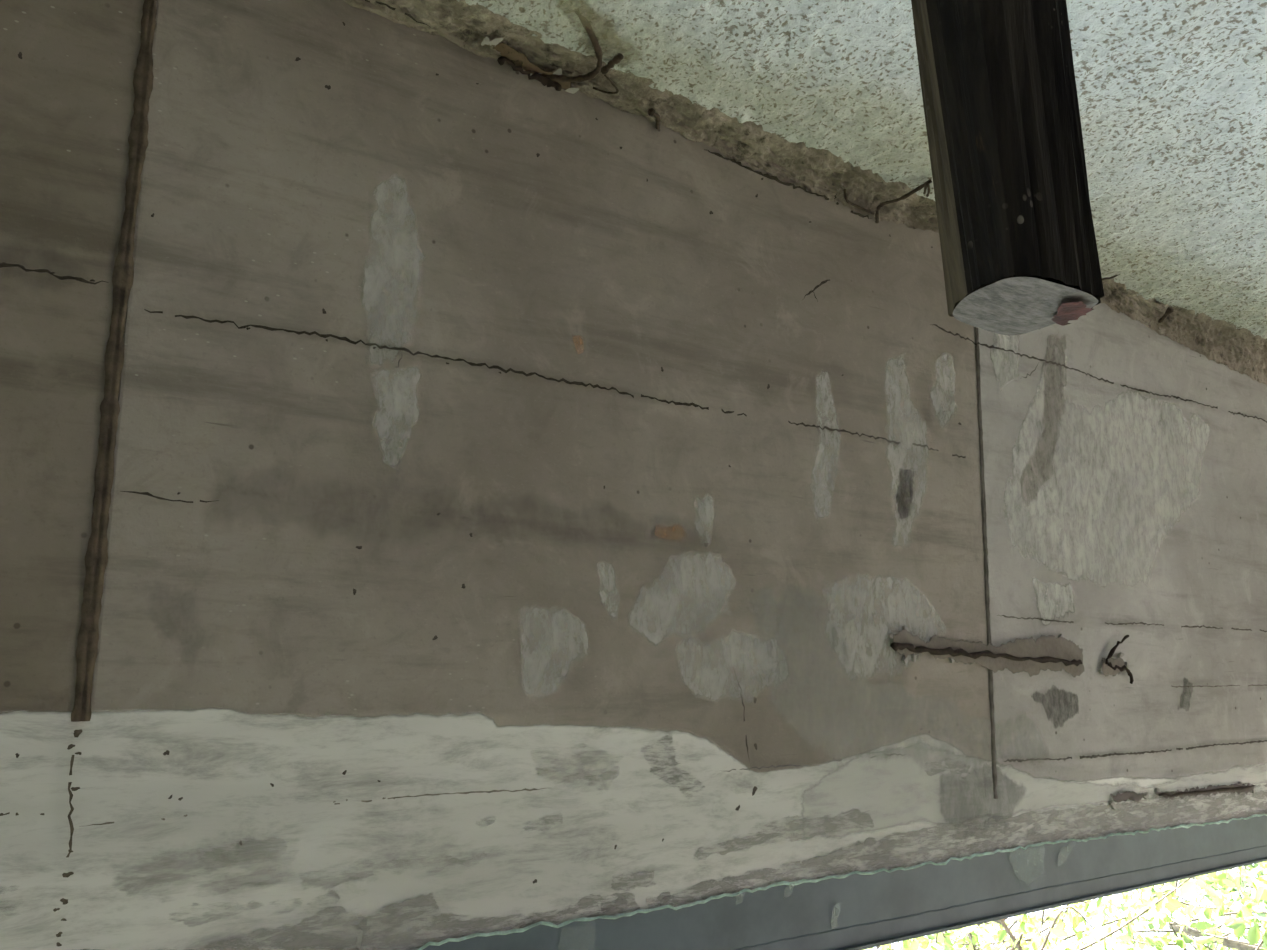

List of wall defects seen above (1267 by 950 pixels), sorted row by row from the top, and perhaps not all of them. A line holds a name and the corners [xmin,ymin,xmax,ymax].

crack [0,262,109,284]
crack [144,309,747,417]
crack [933,324,1267,423]
crack [788,421,966,458]
spalling [888,626,1084,677]
crack [997,615,1074,623]
spalling [1099,635,1134,684]
crack [1105,622,1267,632]
crack [333,788,545,805]
crack [0,729,114,947]
peeling [205,781,1267,950]